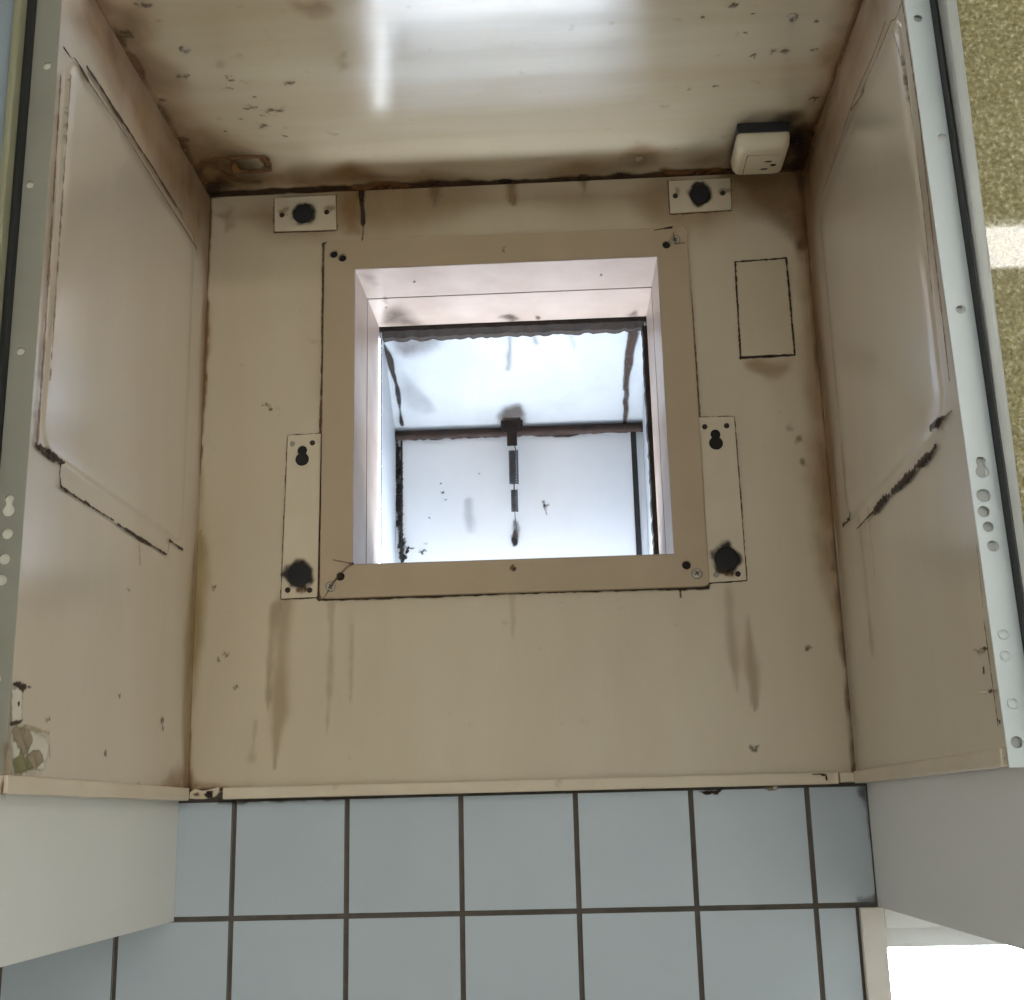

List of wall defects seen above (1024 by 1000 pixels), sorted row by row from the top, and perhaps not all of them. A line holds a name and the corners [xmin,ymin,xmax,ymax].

corrosion [198,155,735,467]
peeling [10,726,49,774]
corrosion [187,734,223,793]